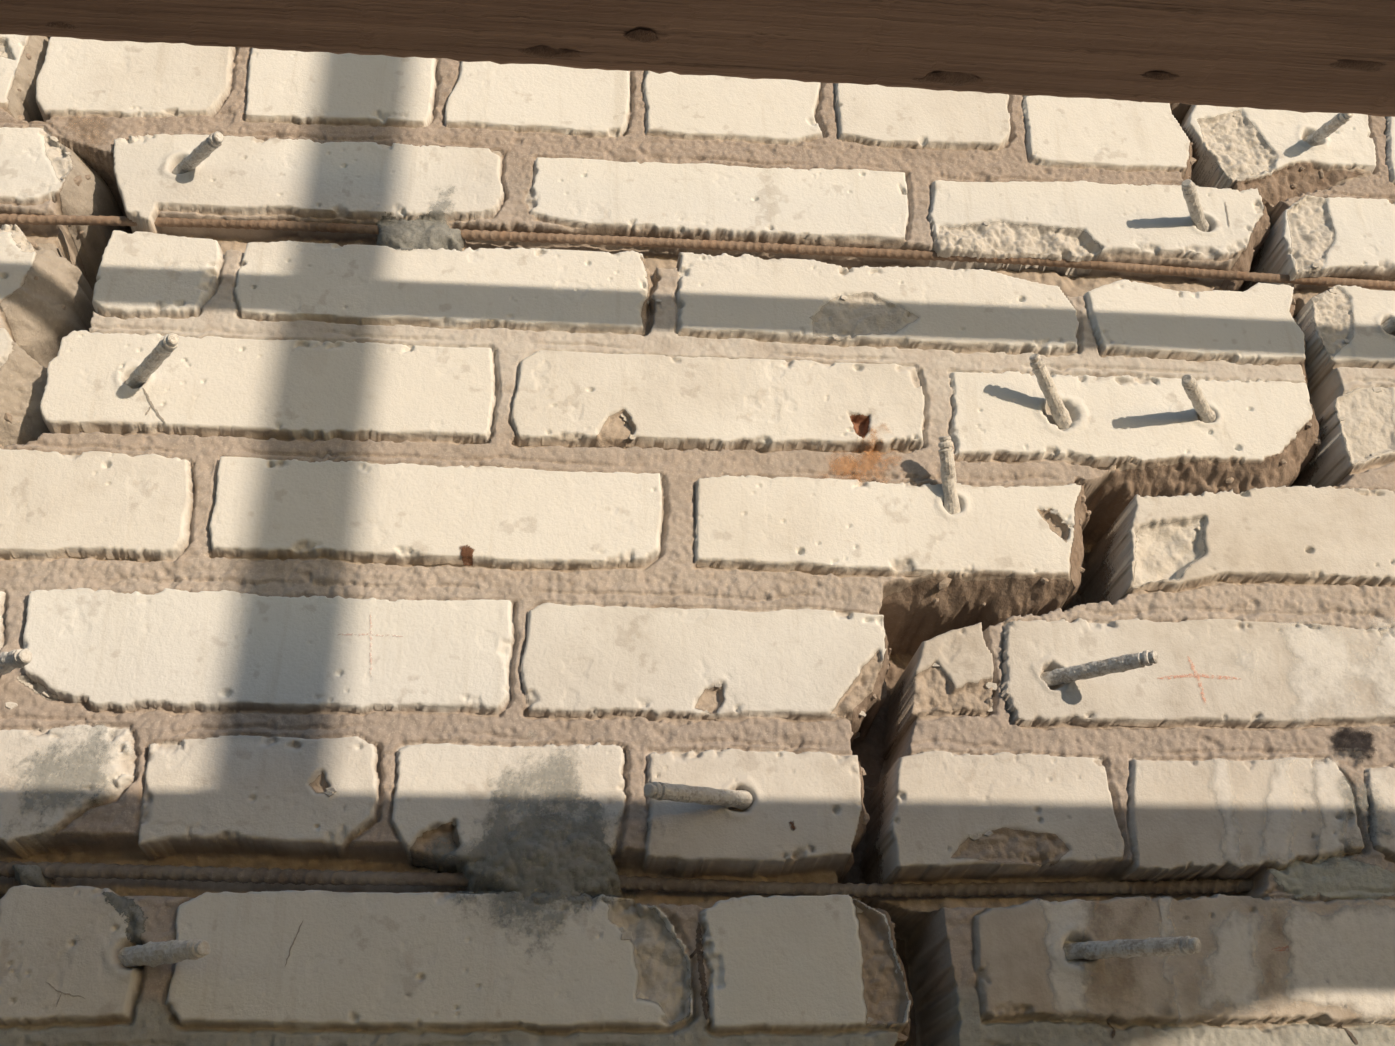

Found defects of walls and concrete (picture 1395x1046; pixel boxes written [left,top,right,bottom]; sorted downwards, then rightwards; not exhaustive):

crack [1169,103,1199,180]
spalling [1194,110,1276,188]
crack [0,35,131,447]
spalling [0,213,137,253]
spalling [154,217,379,235]
spalling [459,195,1395,358]
crack [838,163,1364,1046]
spalling [0,820,470,887]
damp [414,757,636,941]
spalling [605,828,1254,1027]
crack [46,982,85,1007]